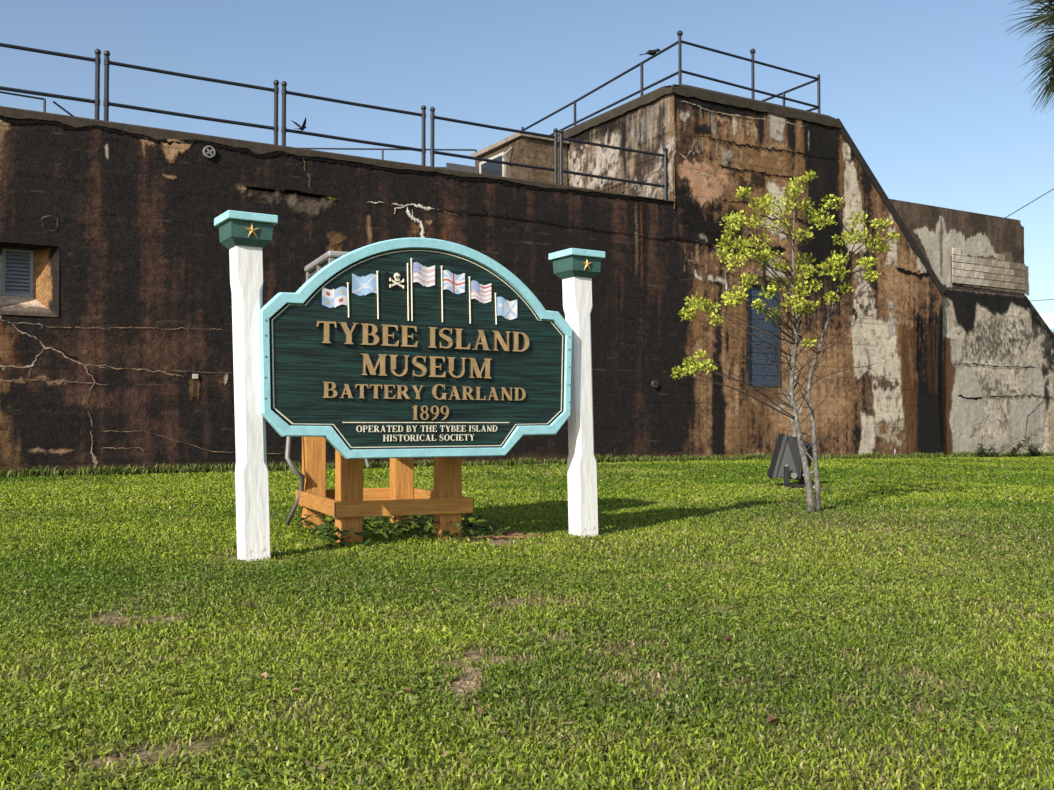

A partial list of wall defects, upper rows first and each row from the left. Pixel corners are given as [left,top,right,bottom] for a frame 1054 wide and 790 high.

crack [0,116,664,204]
leakage [328,233,343,251]
crack [367,201,786,254]
peeling [678,158,738,206]
leakage [567,97,850,294]
crack [699,136,836,178]
peeling [842,142,905,457]
peeling [910,216,1029,296]
crack [0,319,233,468]
leakage [710,362,730,456]
leakage [751,374,802,437]
peeling [951,338,1054,455]